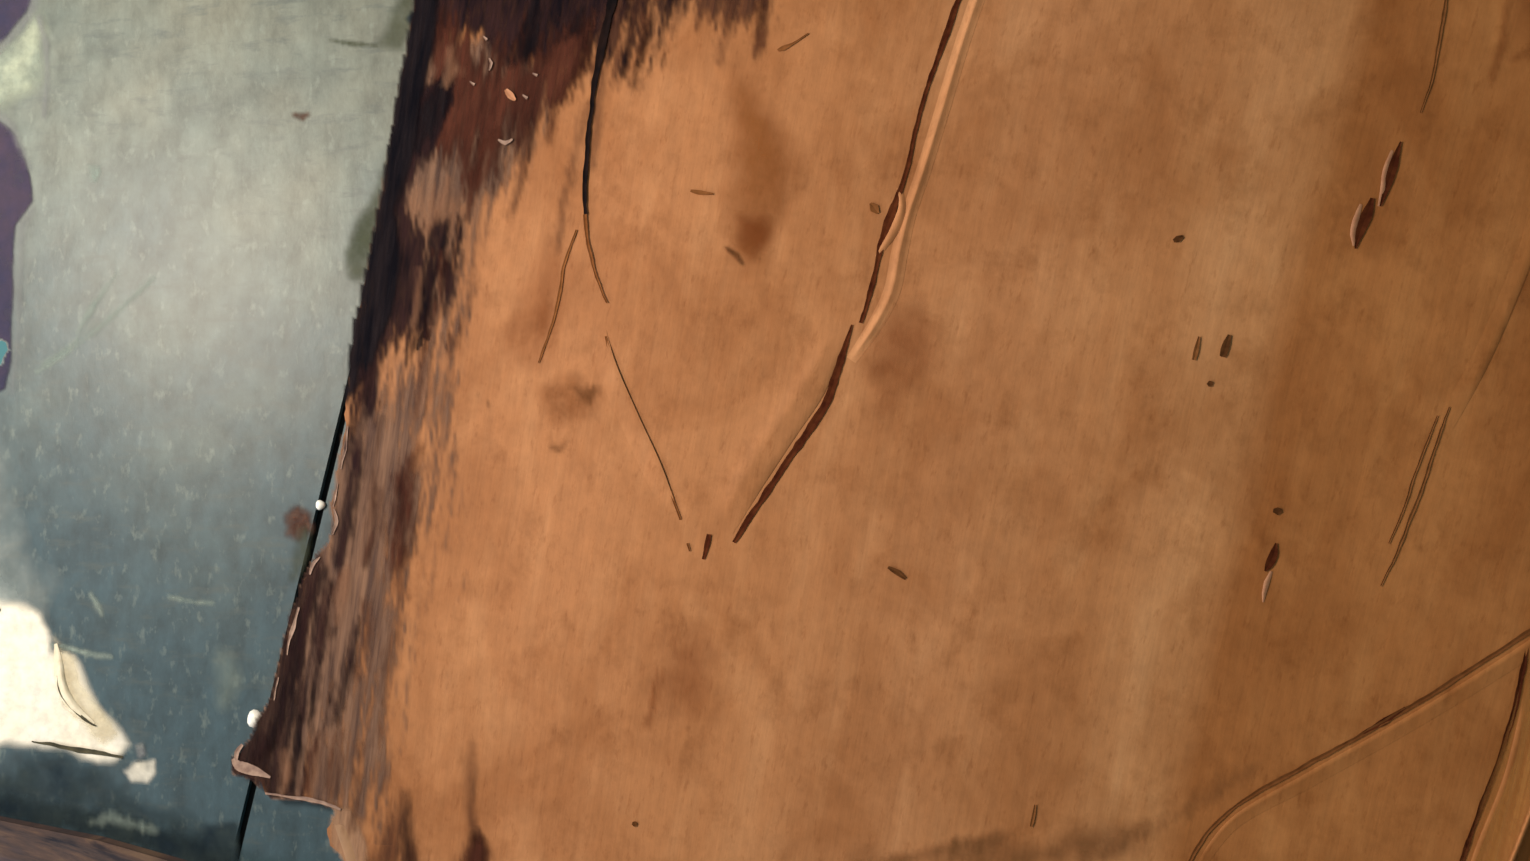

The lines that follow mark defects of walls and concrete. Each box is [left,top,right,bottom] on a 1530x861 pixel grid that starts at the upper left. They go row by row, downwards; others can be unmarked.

damp [726,108,779,264]
crack [538,0,985,559]
corrosion [287,507,311,539]
damp [232,0,768,861]
crack [1380,407,1450,586]
peeling [286,607,300,655]
crack [1189,629,1530,861]